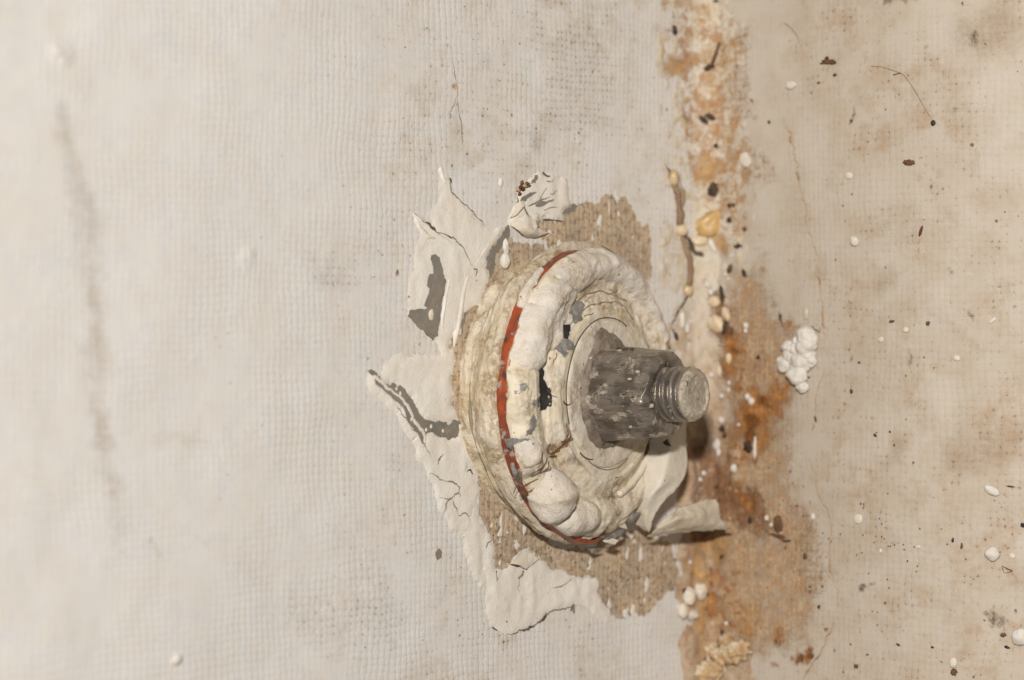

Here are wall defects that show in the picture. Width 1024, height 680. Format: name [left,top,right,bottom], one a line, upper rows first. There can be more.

rust [662,1,765,254]
peeling [707,181,720,197]
peeling [366,189,652,449]
rust [691,292,790,556]
peeling [474,466,687,619]
rust [686,531,747,660]
rust [791,647,814,663]